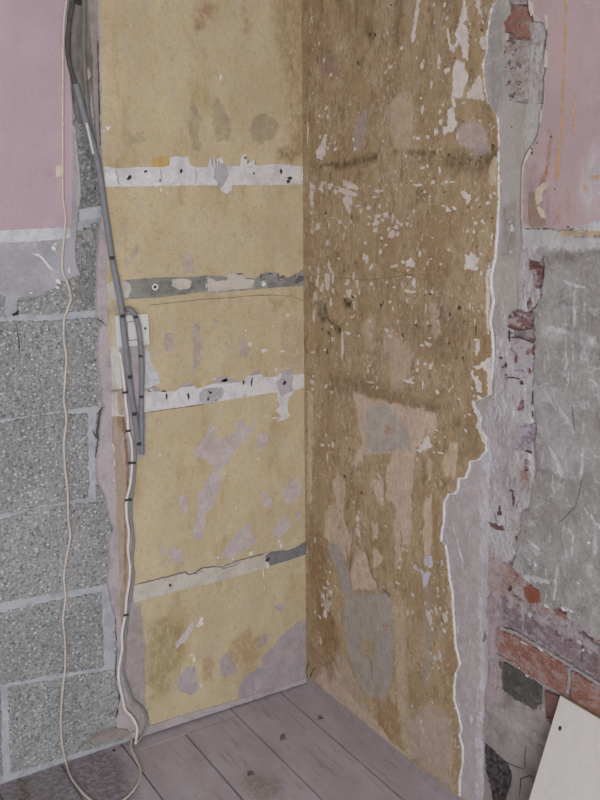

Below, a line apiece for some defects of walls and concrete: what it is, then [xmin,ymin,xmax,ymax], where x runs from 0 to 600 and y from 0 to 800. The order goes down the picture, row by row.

peeling [415,0,487,140]
flaking render [503,0,534,102]
peeling [316,134,337,160]
peeling [296,166,415,254]
peeling [521,146,549,227]
peeling [309,257,373,361]
flaking render [390,251,536,444]
flaking render [529,259,545,289]
flaking render [514,390,537,492]
crack [135,553,265,585]
flaking render [483,555,600,724]
spalling [485,743,512,800]